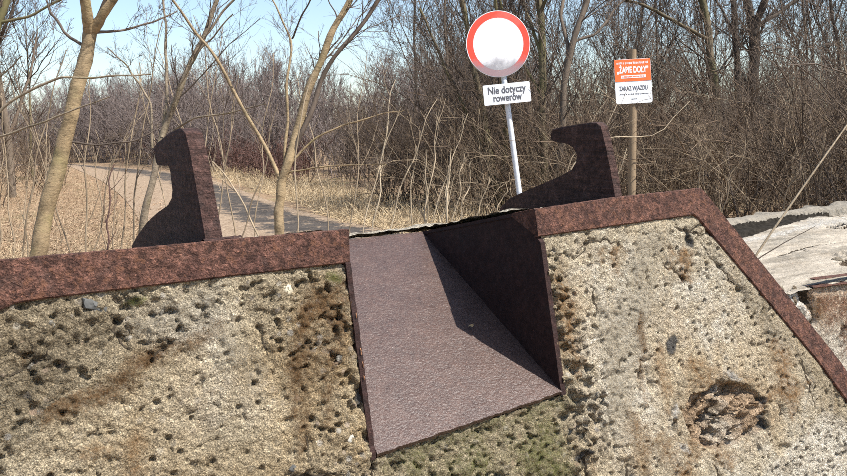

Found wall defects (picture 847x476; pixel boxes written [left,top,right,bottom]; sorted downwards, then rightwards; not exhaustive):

crack [577,238,623,257]
rust [806,273,847,289]
spalling [681,380,765,451]
crack [284,460,376,476]